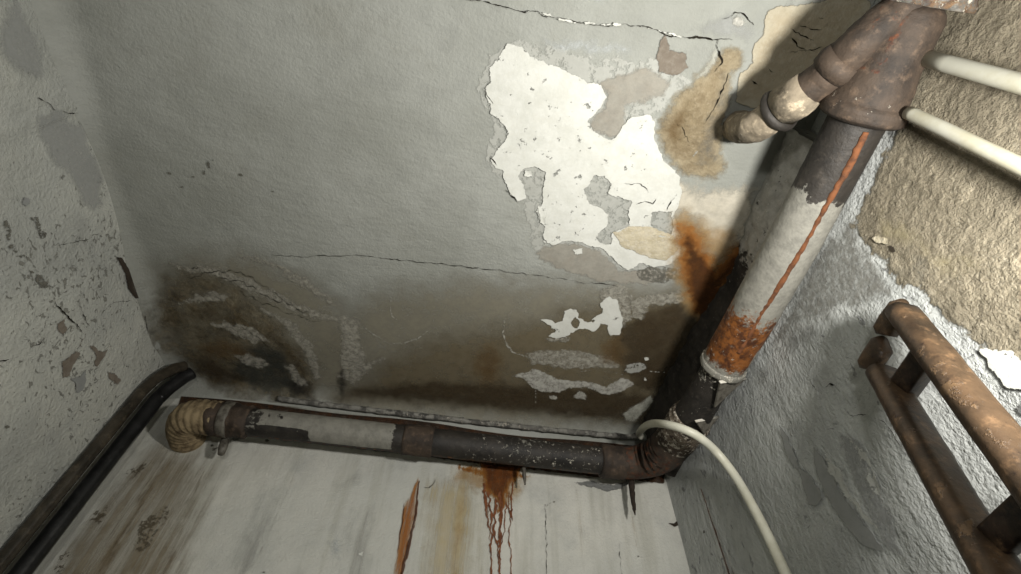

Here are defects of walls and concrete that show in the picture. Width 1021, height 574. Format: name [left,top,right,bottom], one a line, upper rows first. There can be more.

crack [470,0,723,71]
flaking render [715,0,871,108]
flaking render [933,0,1021,72]
peeling [477,36,690,285]
flaking render [910,67,1021,156]
rust [674,216,739,316]
flaking render [849,122,1021,361]
leakage [151,258,698,434]
rust [178,396,631,447]
rust [396,481,420,574]
rust [431,456,599,574]
rust [624,475,665,484]